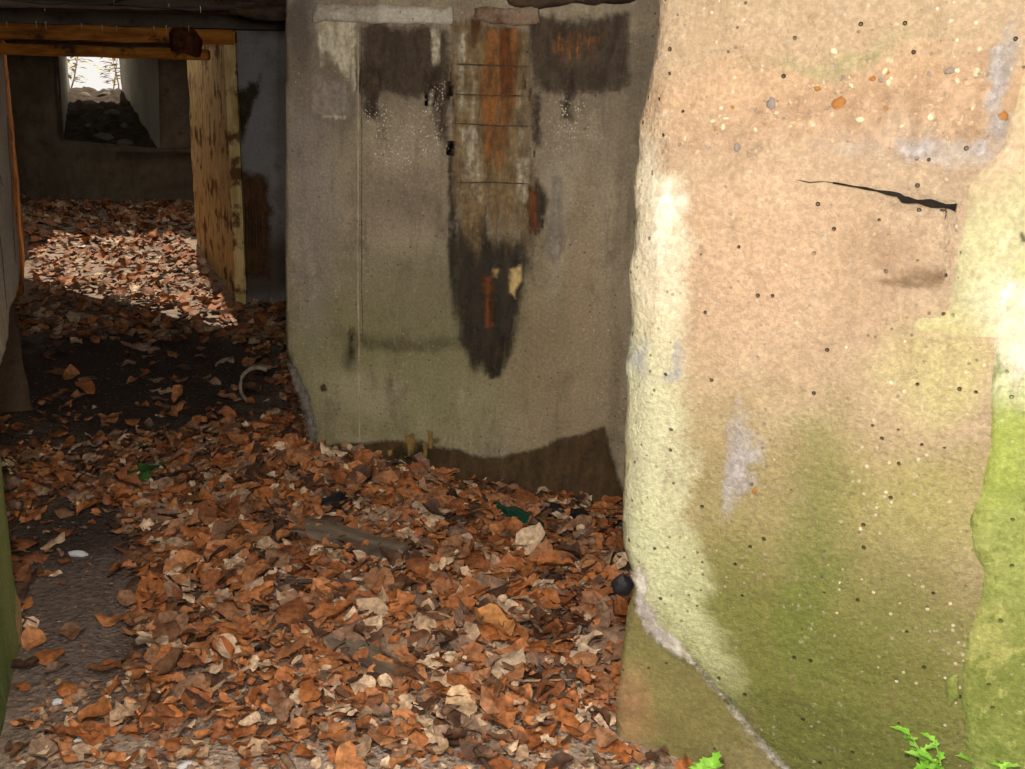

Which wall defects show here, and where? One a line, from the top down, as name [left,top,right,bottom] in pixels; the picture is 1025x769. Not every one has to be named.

corrosion [471,19,519,172]
damp [311,13,630,378]
corrosion [528,185,539,235]
crack [798,180,957,218]
corrosion [482,275,494,329]
peeling [493,266,522,296]